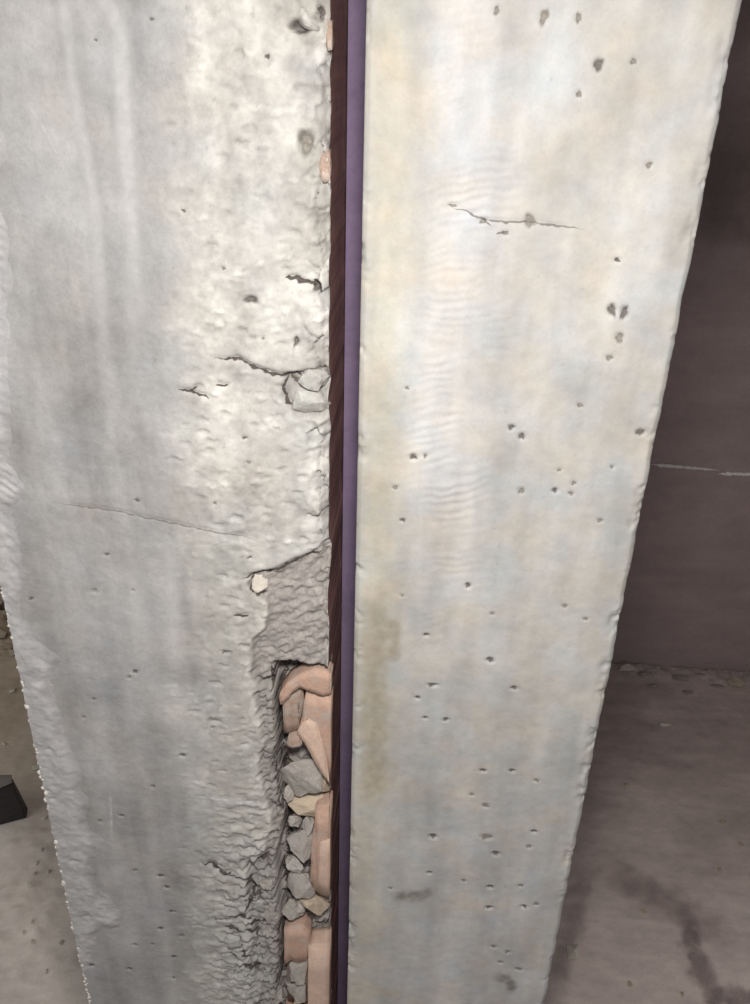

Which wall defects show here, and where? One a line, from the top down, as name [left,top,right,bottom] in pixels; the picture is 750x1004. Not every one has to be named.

crack [457,209,576,234]
crack [179,384,228,399]
crack [220,357,302,404]
peeling [188,542,334,1004]
crack [202,659,294,989]